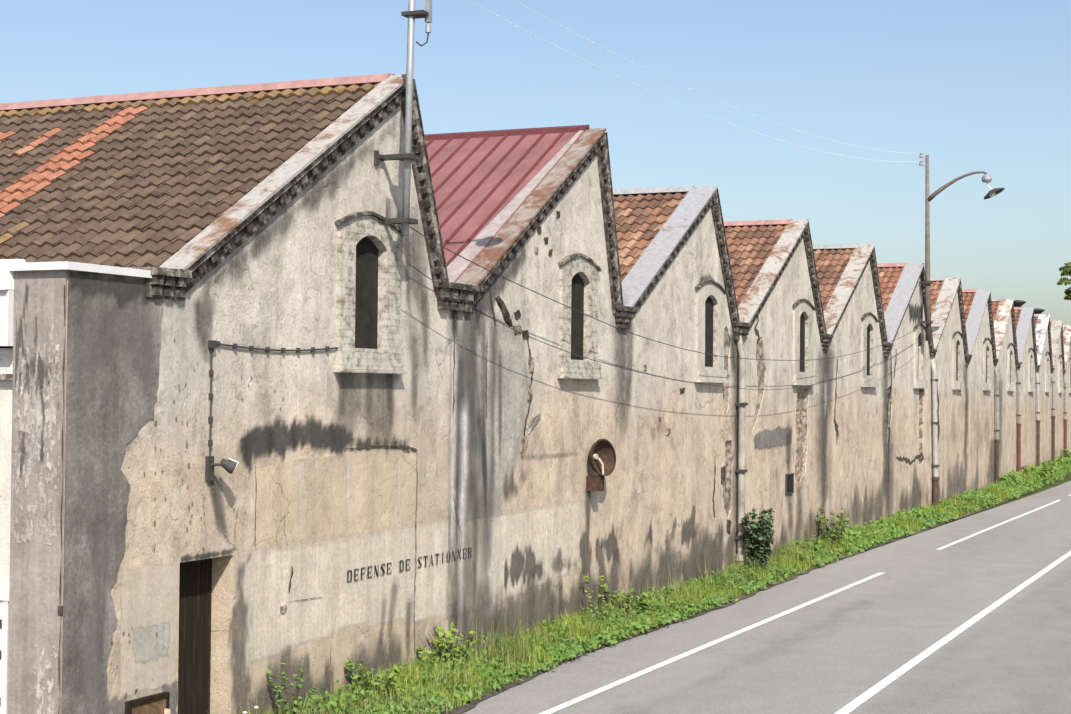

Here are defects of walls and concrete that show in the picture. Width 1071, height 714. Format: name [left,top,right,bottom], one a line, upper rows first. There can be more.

peeling [12,325,62,545]
water stain [450,248,733,654]
flaking render [752,316,766,434]
flaking render [794,387,809,483]
crack [896,386,940,465]
peeling [34,646,57,714]